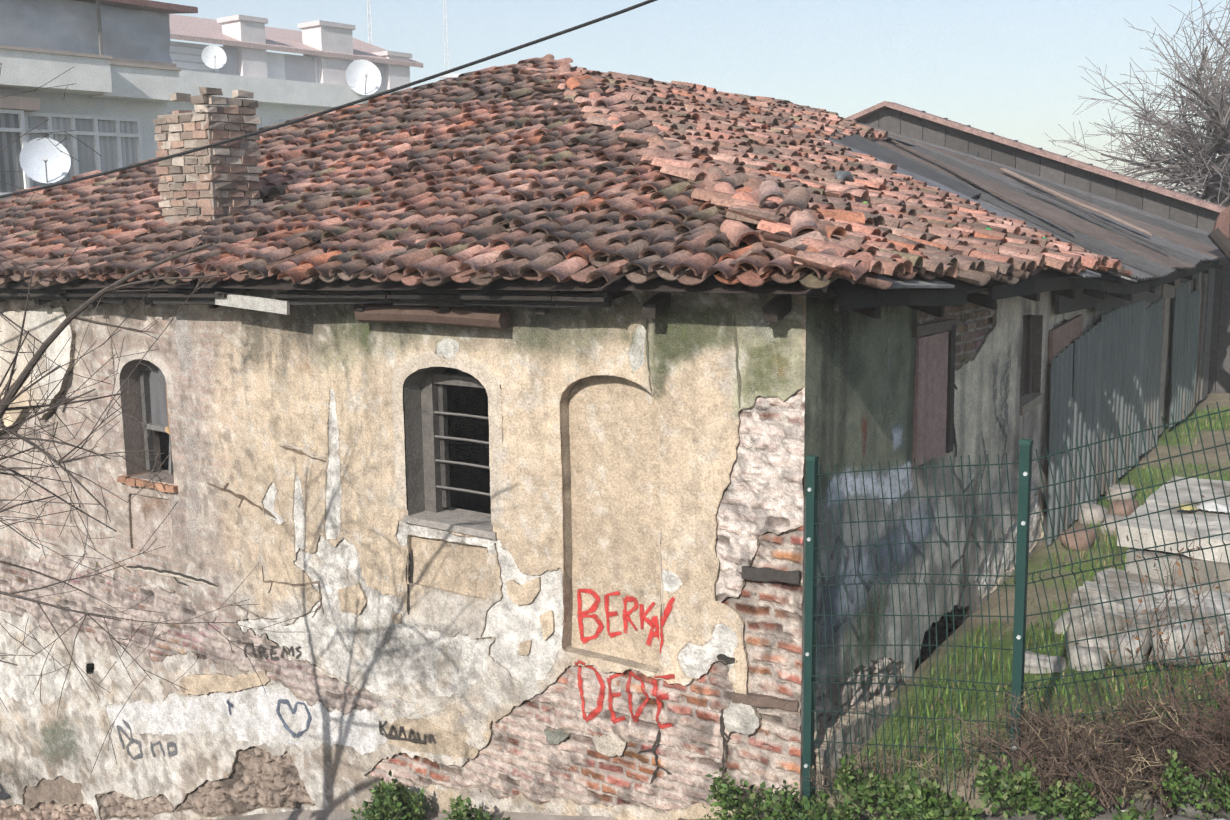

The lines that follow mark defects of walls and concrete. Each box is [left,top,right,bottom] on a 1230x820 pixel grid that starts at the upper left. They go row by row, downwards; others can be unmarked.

damp [655,307,731,390]
spalling [917,292,997,370]
spalling [0,387,1044,820]